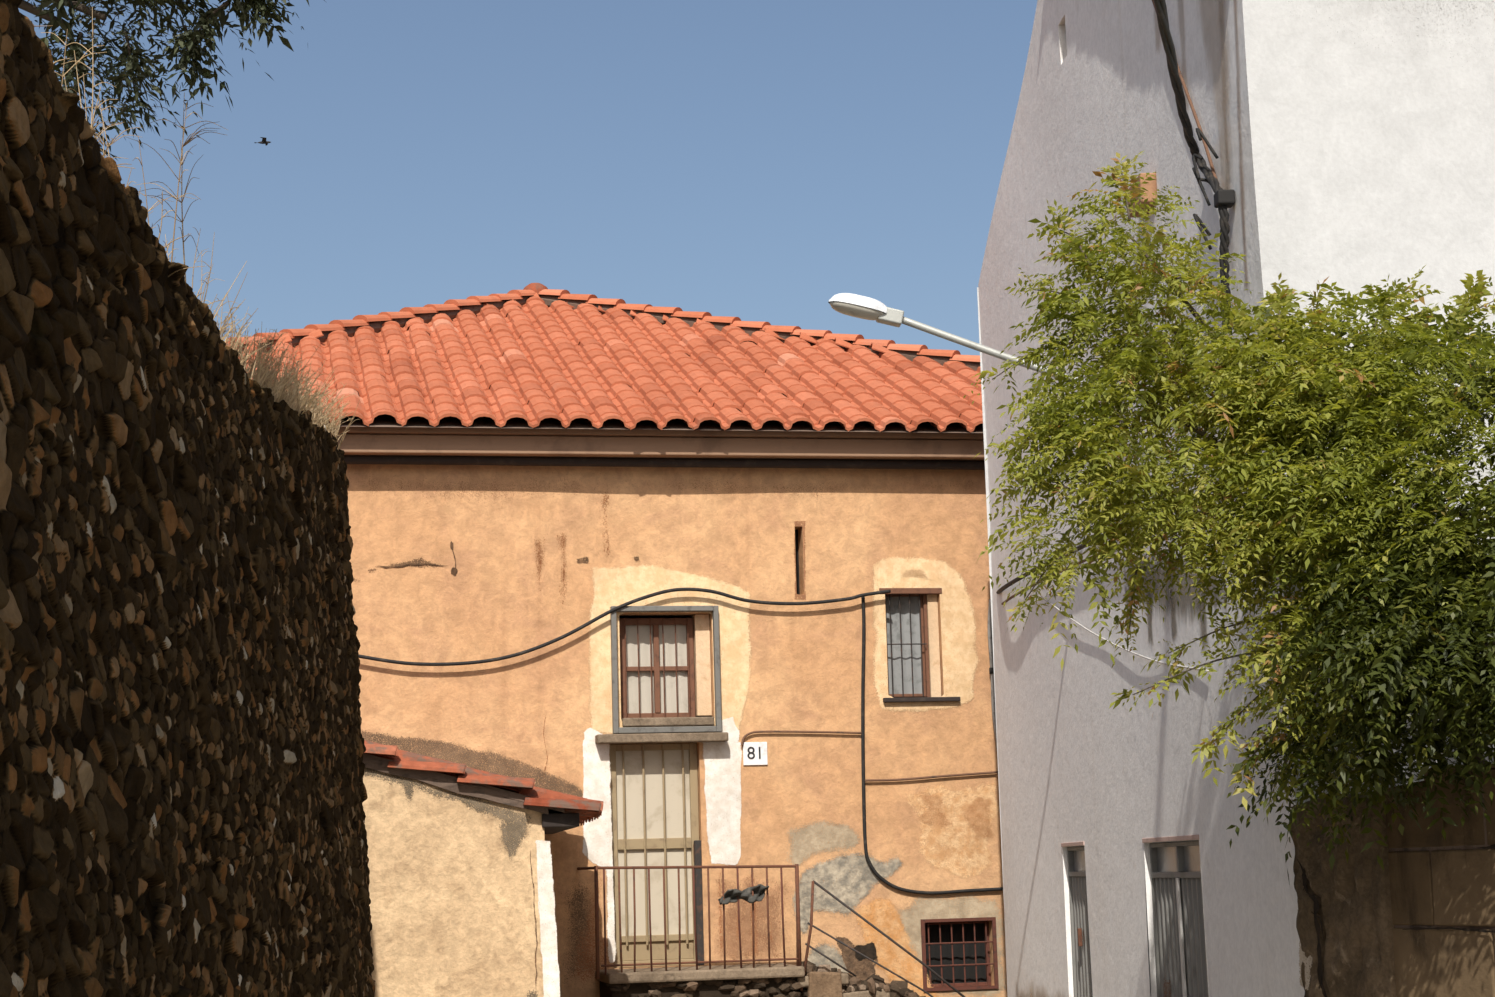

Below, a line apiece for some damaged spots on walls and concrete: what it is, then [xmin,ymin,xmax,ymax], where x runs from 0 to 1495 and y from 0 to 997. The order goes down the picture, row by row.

water stain [364,767,534,860]
crack [1297,861,1327,997]